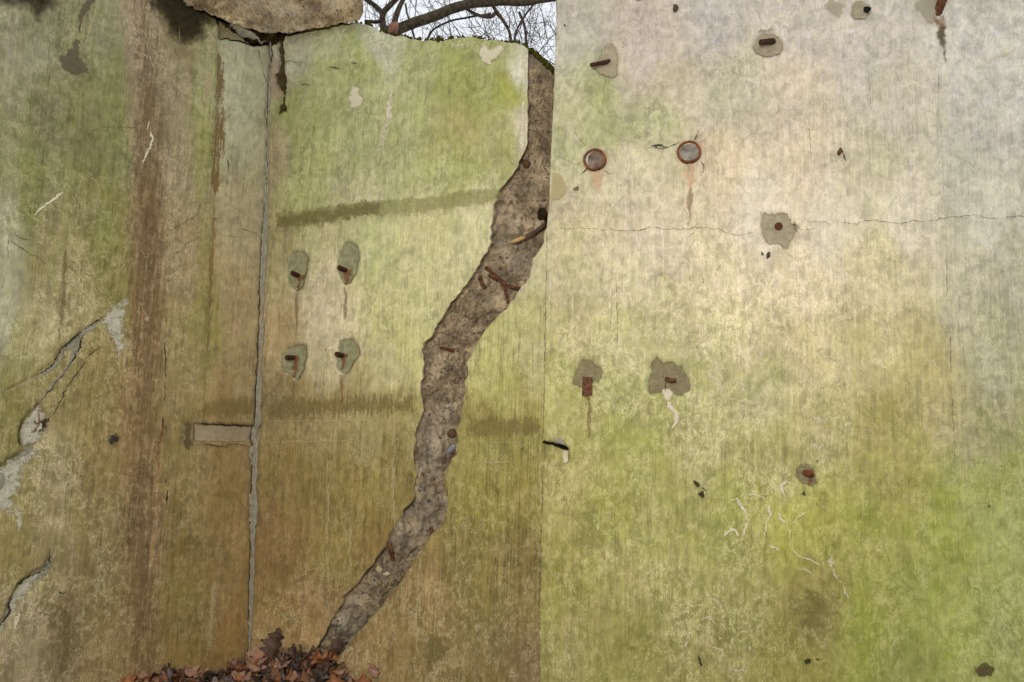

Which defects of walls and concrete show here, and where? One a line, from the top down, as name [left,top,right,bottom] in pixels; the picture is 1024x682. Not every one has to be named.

spalling [761,212,799,248]
spalling [99,300,129,355]
crack [317,53,770,656]
spalling [648,356,690,396]
spalling [0,405,49,530]